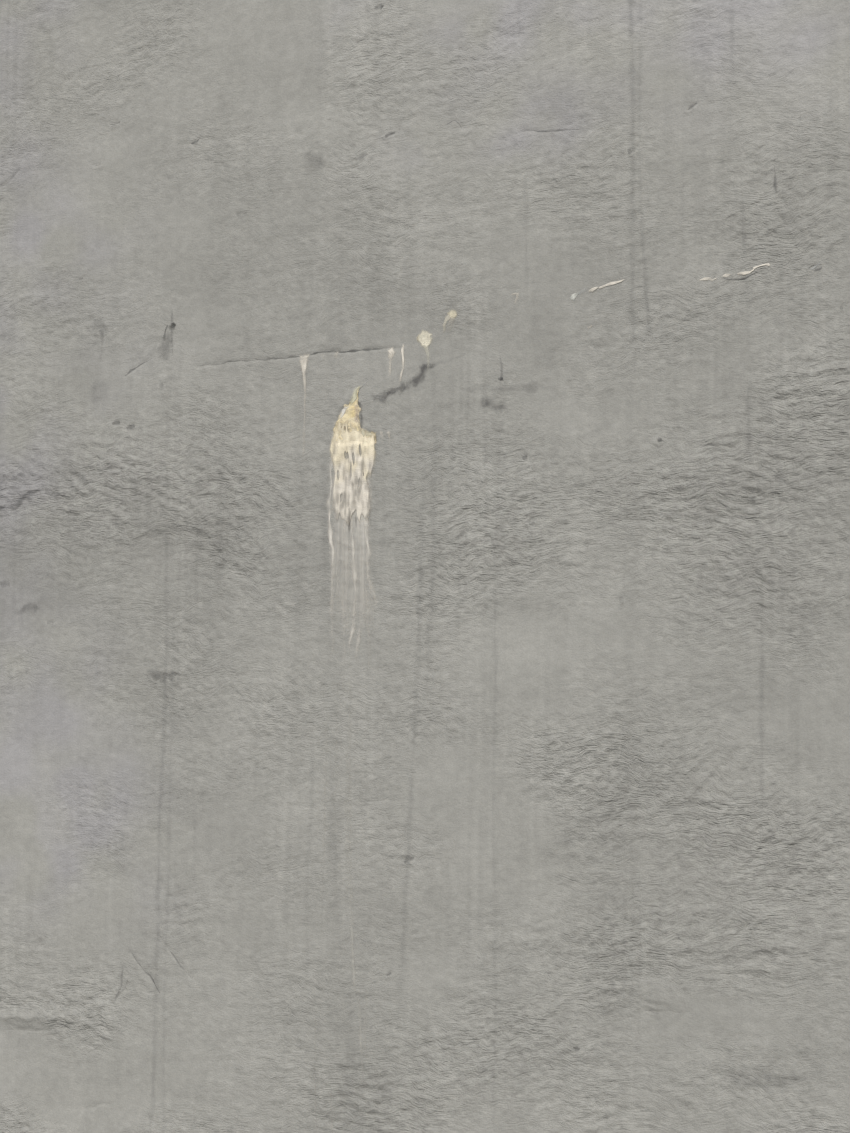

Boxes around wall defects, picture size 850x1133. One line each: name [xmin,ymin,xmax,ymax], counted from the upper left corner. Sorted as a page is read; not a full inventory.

damp [328,422,375,601]